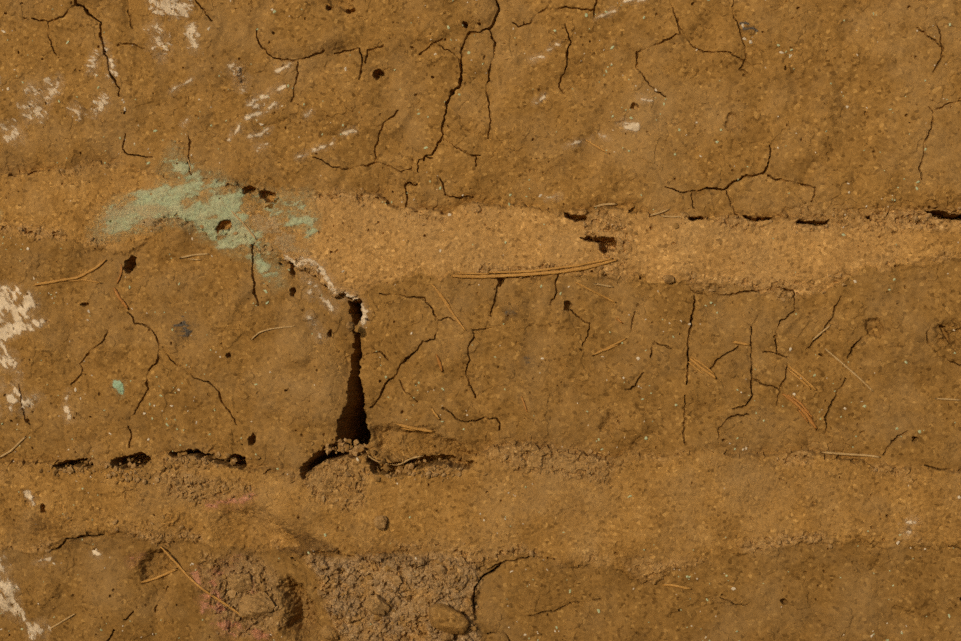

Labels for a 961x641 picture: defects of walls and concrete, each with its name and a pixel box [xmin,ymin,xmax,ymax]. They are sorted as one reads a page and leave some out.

crack [31,0,145,97]
crack [122,133,153,158]
crack [185,135,193,175]
crack [195,0,213,22]
crack [256,30,385,103]
crack [312,0,598,211]
crack [635,0,750,98]
crack [664,145,817,216]
crack [916,18,944,73]
crack [918,100,961,180]
crack [70,312,237,449]
crack [362,284,501,431]